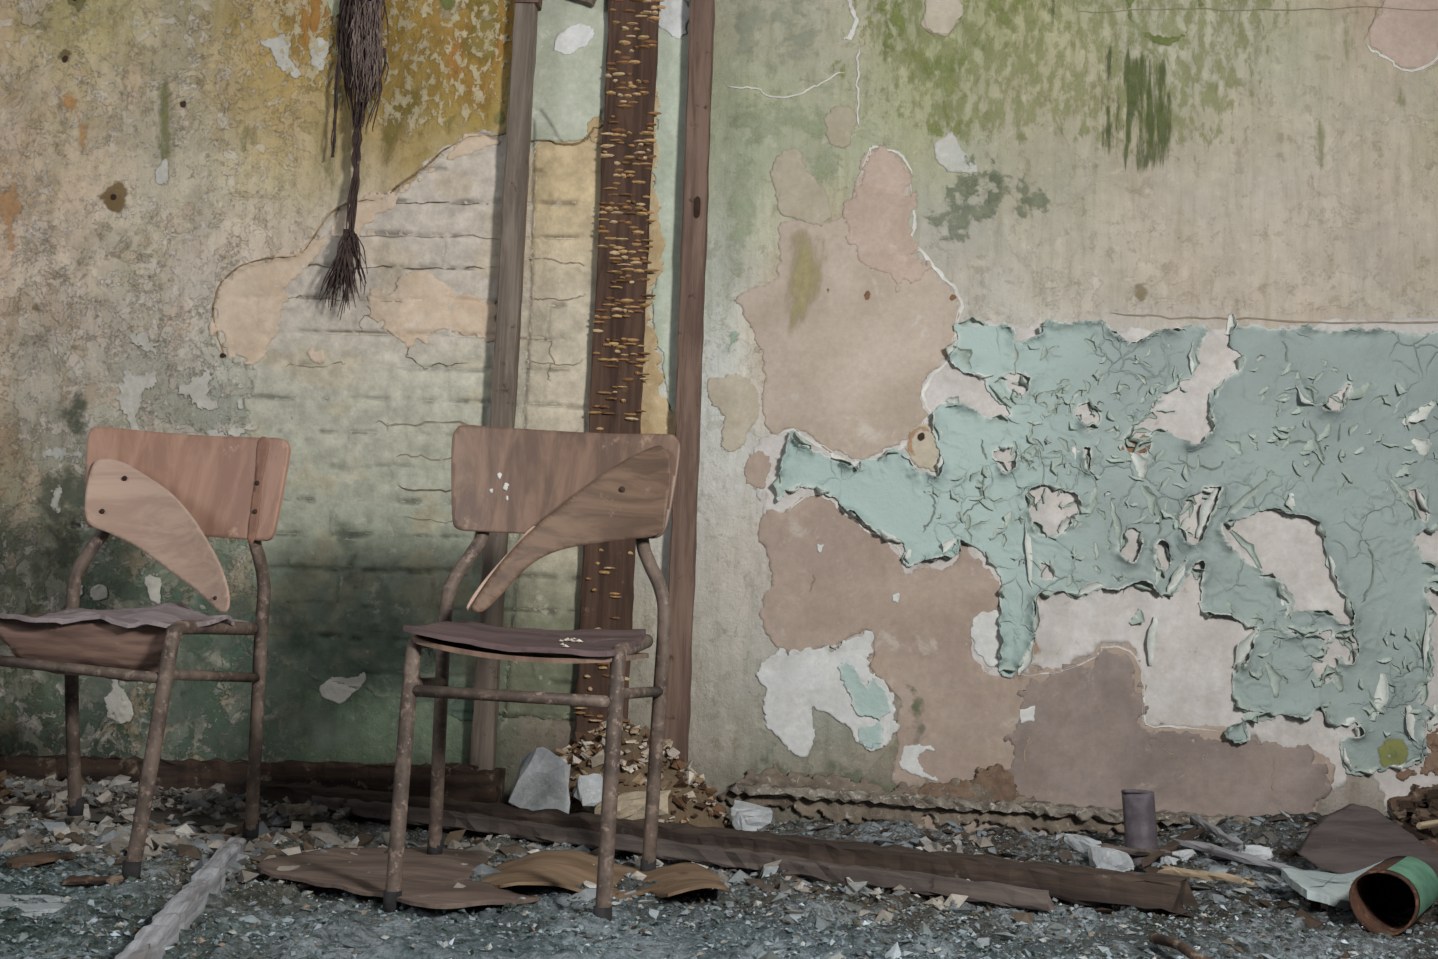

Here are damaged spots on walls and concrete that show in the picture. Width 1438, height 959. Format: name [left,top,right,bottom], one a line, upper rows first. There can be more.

leakage [1145,33,1184,46]
peeling [1364,0,1438,72]
leakage [161,85,169,159]
leakage [100,182,127,211]
flaking render [514,0,608,433]
peeling [641,0,690,436]
flaking render [178,129,506,721]
leakage [38,393,86,565]
peeling [707,106,1438,837]
peeling [144,575,162,604]
flaking render [503,545,583,630]
peeling [104,679,134,724]